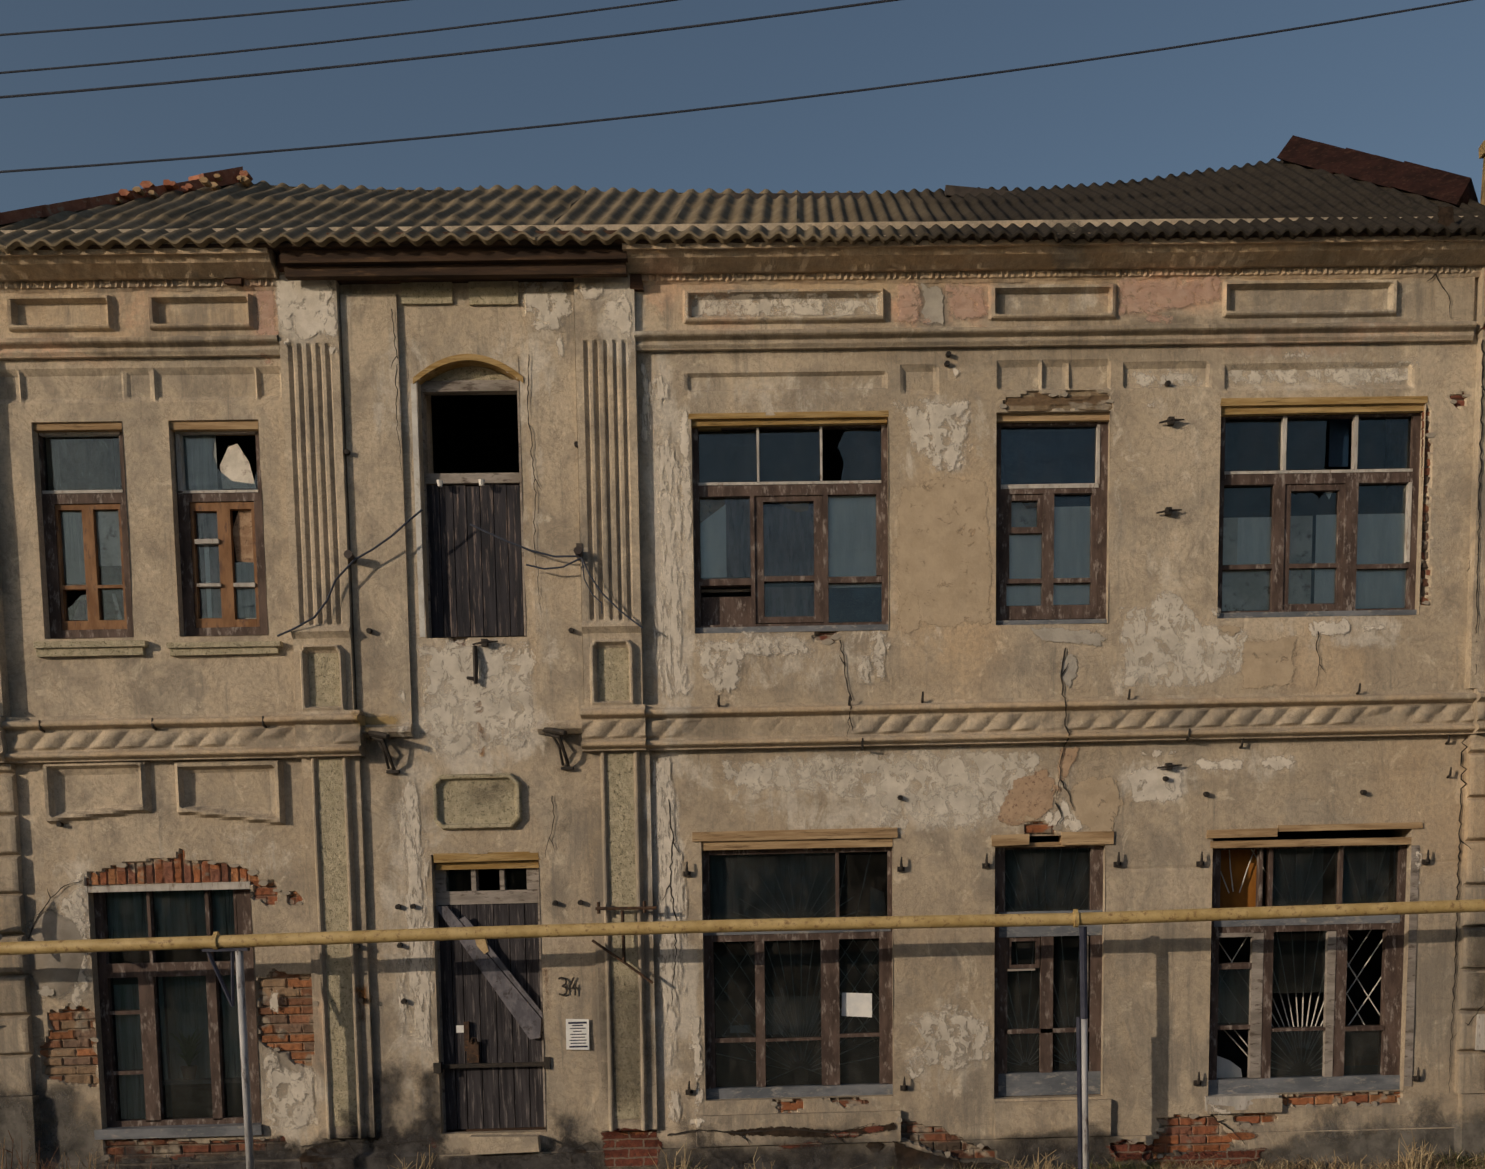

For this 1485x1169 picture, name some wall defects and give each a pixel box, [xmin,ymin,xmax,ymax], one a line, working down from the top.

flaking render [256,274,339,355]
flaking render [894,398,993,635]
flaking render [397,639,536,759]
crack [839,640,853,740]
crack [1055,648,1074,826]
flaking render [722,746,1244,834]
flaking render [40,850,303,1086]
damp [0,1084,102,1169]
flaking render [101,970,338,1169]
damp [123,1068,595,1169]
flaking render [728,1098,1000,1169]
flaking render [1105,1092,1400,1169]